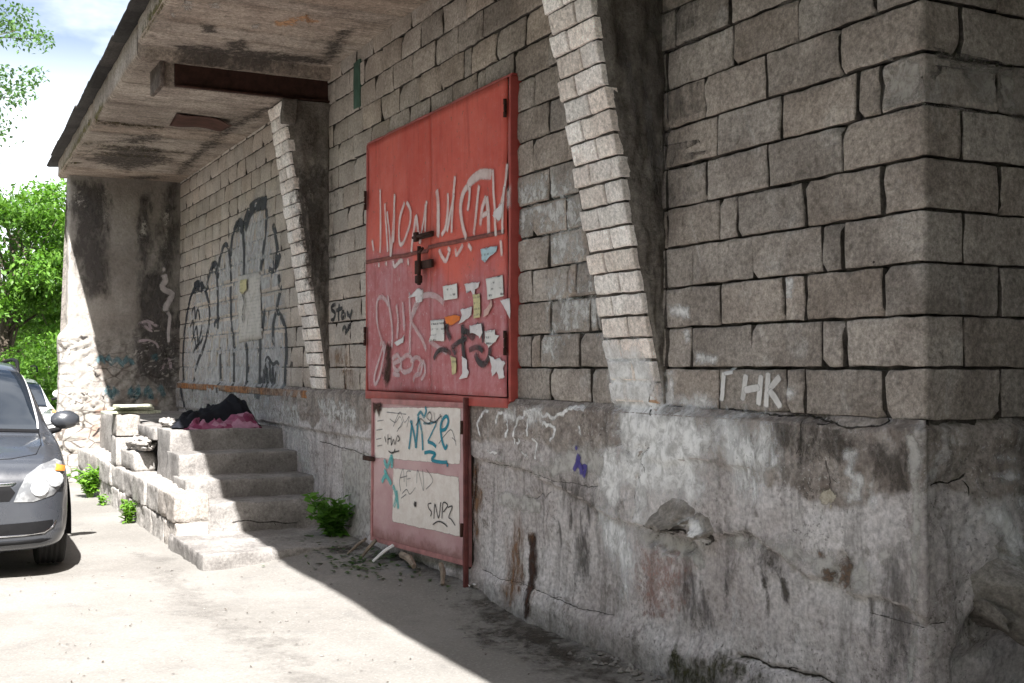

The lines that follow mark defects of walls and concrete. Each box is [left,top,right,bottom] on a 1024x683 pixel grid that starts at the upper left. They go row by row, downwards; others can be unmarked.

leakage [176,30,352,73]
leakage [86,107,269,180]
leakage [519,175,584,266]
leakage [476,405,585,459]
leakage [543,280,908,592]
crack [729,408,890,488]
crack [930,473,969,493]
corrosion [505,522,537,619]
crack [484,570,613,615]
leakage [760,546,790,610]